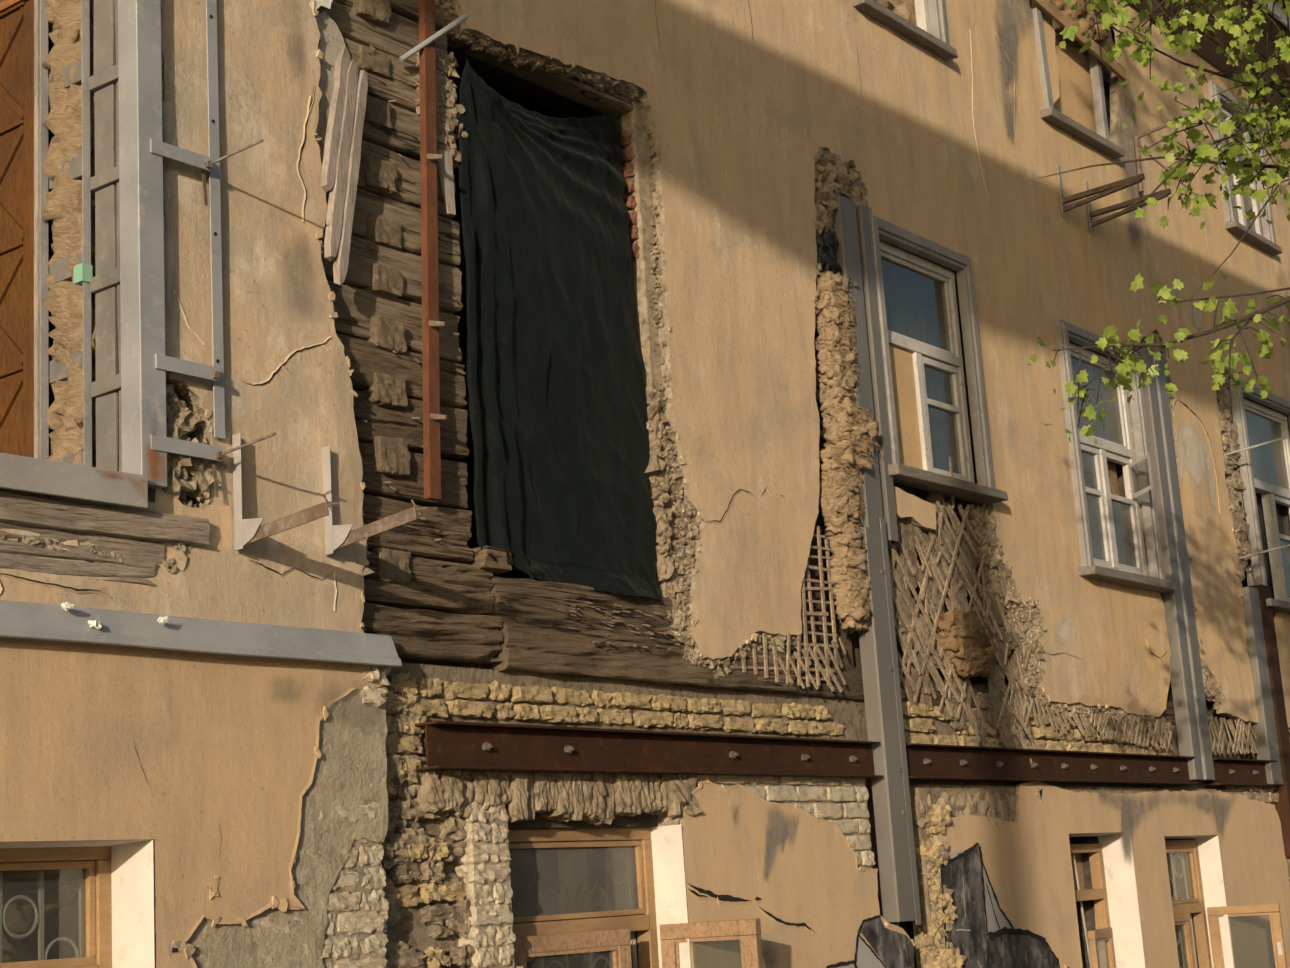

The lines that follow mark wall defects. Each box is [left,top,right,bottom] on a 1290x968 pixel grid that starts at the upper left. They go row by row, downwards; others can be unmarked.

spalling [309,0,333,108]
spalling [435,0,647,107]
crack [241,336,332,385]
spalling [642,123,802,679]
crack [705,487,784,524]
crack [244,558,338,611]
spalling [959,505,1155,728]
peeling [168,687,355,968]
spalling [383,672,468,929]
damp [766,811,796,873]
spalling [385,944,476,968]
crack [686,883,817,936]